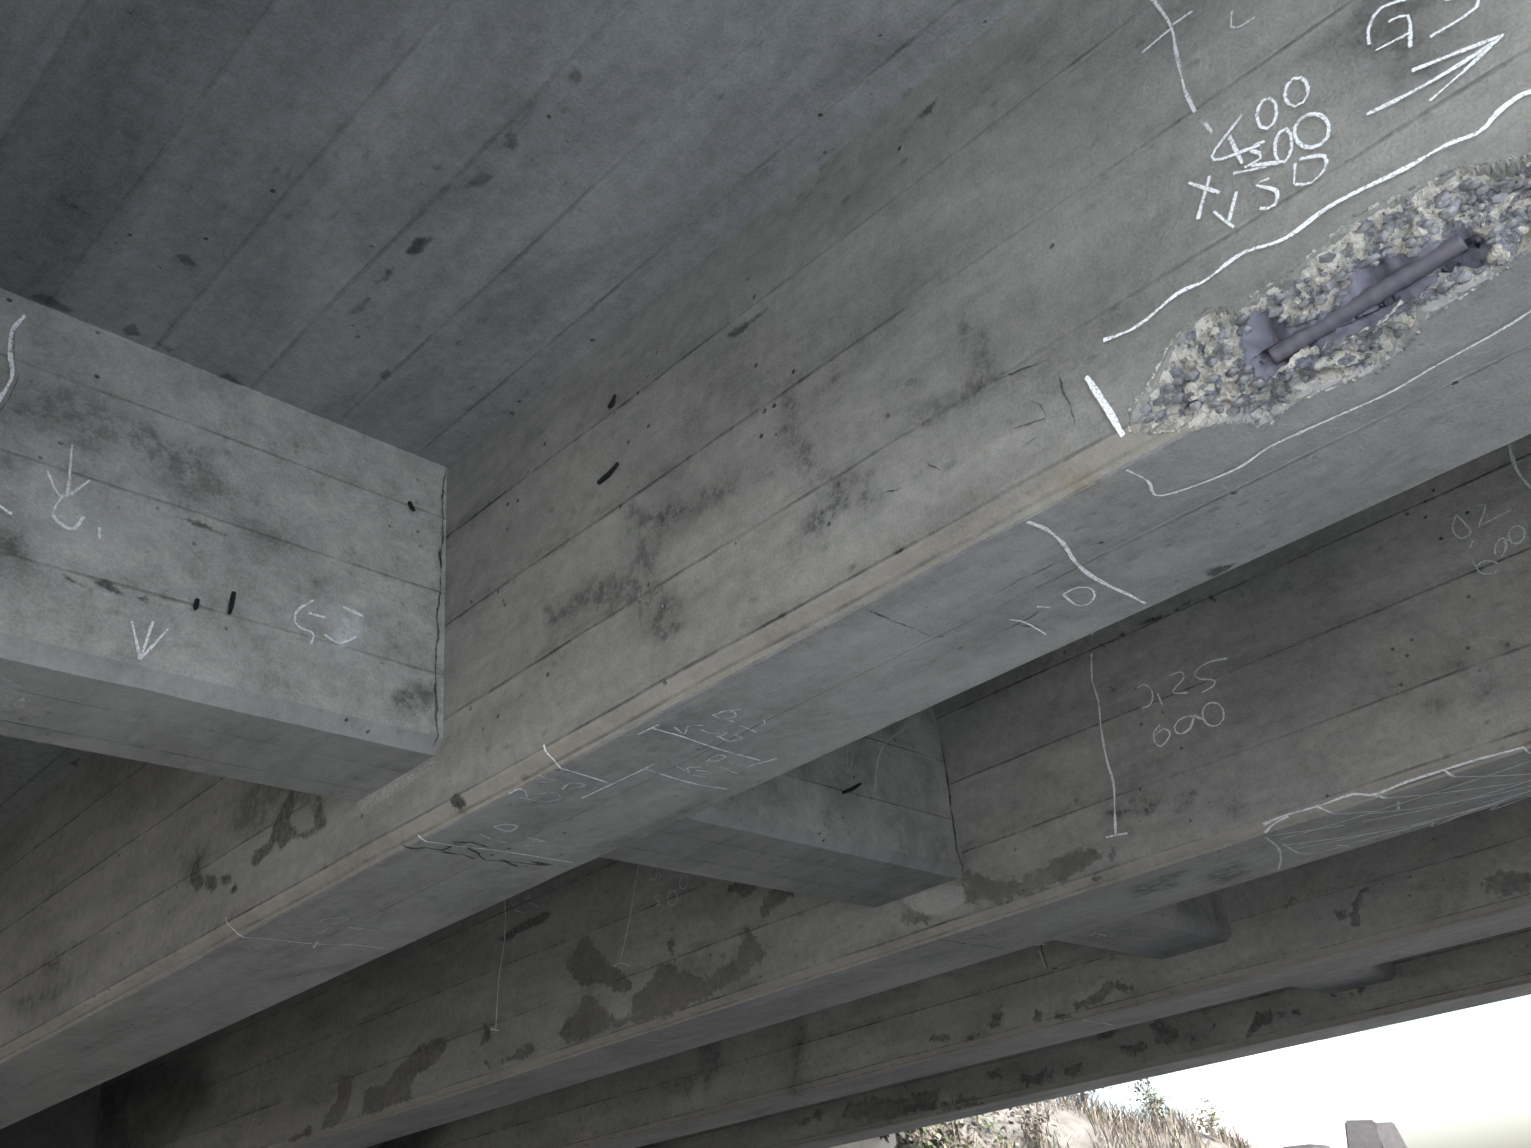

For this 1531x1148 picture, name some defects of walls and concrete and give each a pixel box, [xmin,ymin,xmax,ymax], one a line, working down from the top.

spalling [1127,155,1531,435]
damp [191,858,237,893]
damp [251,791,325,865]
crack [403,842,548,867]